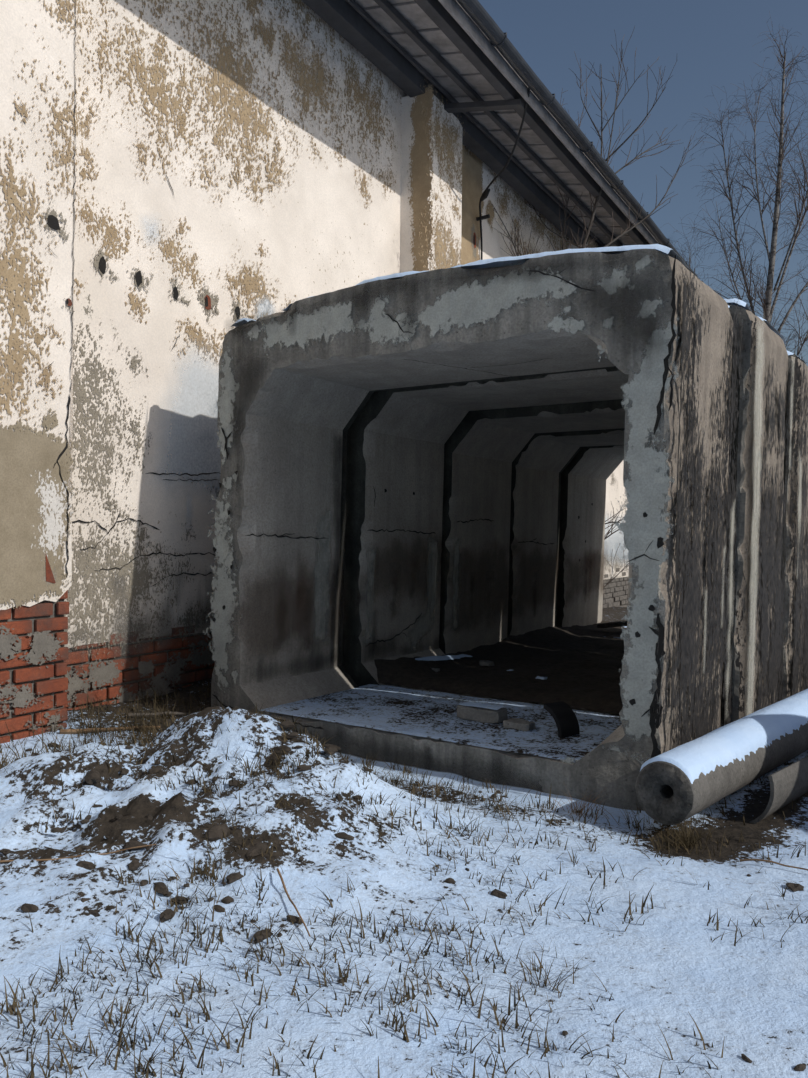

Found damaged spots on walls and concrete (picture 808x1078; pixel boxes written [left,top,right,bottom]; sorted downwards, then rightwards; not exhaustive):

crack [48,0,216,587]
crack [245,532,326,540]
peeling [0,0,585,744]
water stain [315,512,330,640]
crack [628,255,685,759]
spalling [594,255,808,764]
water stain [722,508,734,619]
water stain [747,327,763,715]
water stain [789,449,802,521]